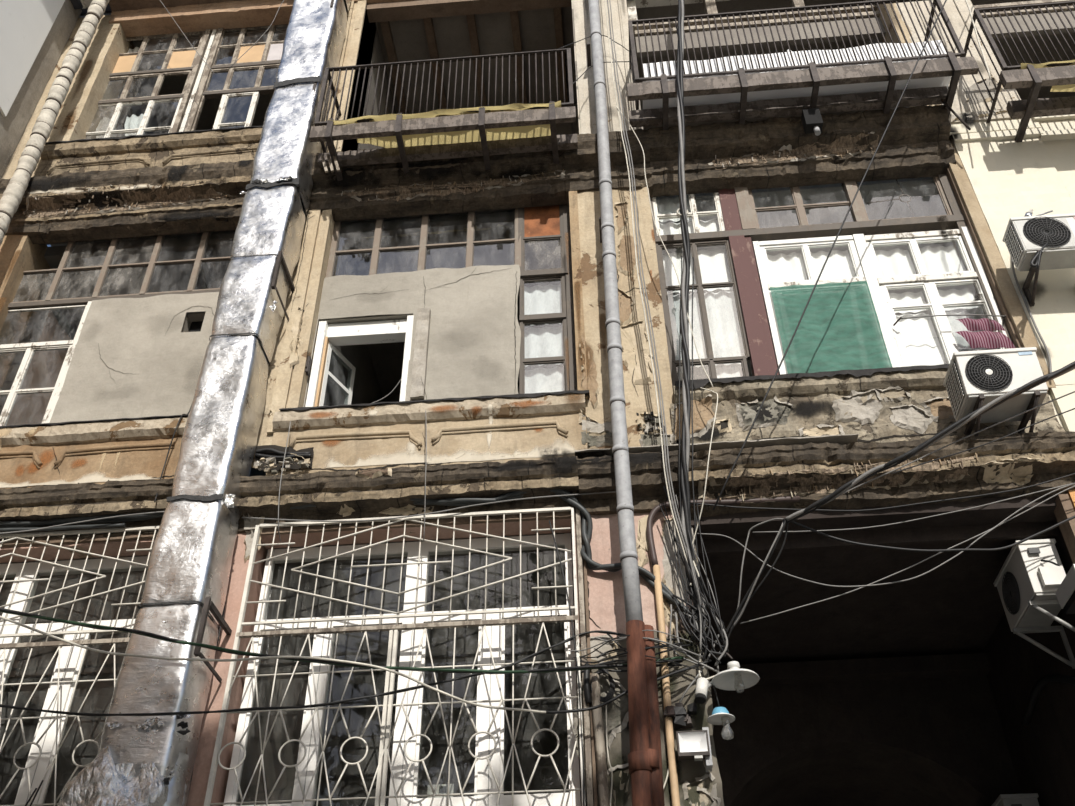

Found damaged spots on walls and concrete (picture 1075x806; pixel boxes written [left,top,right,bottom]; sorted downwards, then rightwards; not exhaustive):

spalling [708,130,879,170]
spalling [23,181,232,218]
spalling [336,170,565,202]
spalling [614,201,640,276]
spalling [618,288,653,385]
spalling [579,336,613,447]
spalling [636,394,795,446]
spalling [798,386,955,436]
spalling [254,445,314,474]
spalling [698,453,1043,502]
spalling [243,512,265,562]
spalling [670,772,721,806]